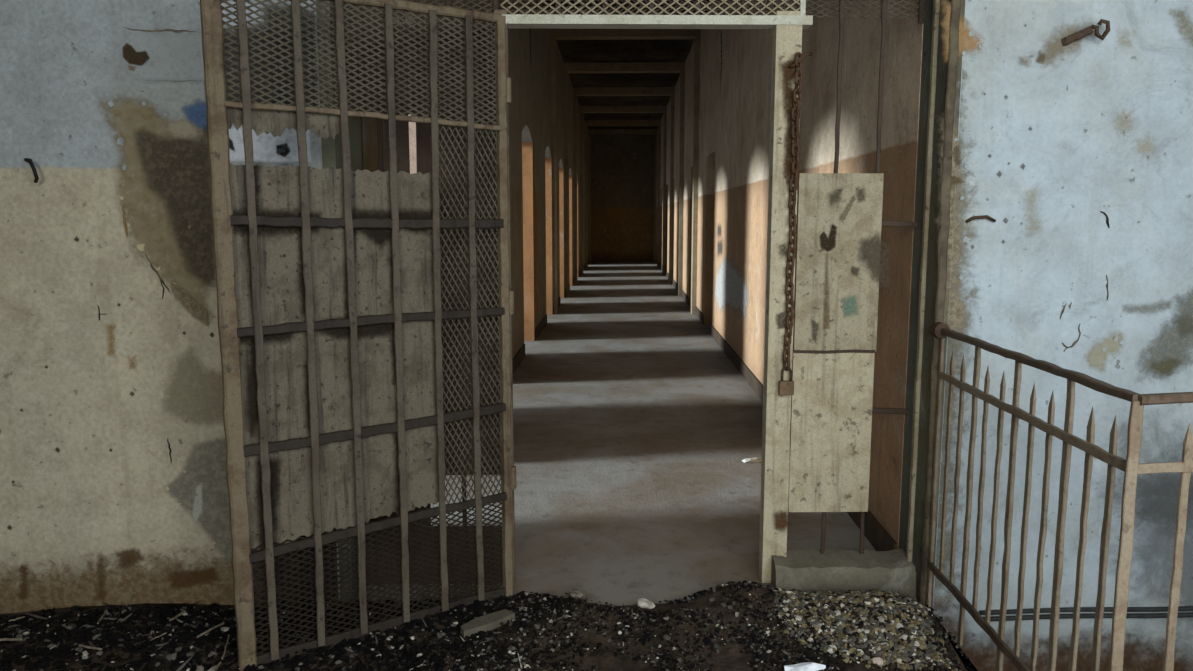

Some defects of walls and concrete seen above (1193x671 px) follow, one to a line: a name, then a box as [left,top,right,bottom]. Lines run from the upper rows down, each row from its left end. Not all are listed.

spalling [123,43,153,70]
corrosion [1021,28,1086,64]
leakage [933,164,1193,671]
leakage [0,550,234,613]